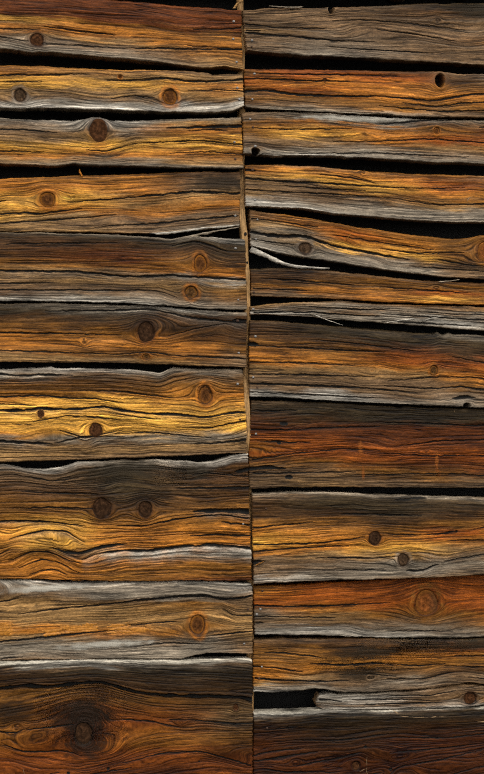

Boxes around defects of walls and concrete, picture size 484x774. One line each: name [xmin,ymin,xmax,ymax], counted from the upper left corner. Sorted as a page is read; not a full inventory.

crack [0,74,77,82]
crack [109,73,484,157]
crack [0,125,482,227]
crack [250,219,484,272]
crack [0,681,253,701]
crack [254,652,484,705]
crack [0,724,84,757]
crack [125,719,293,730]
crack [97,734,484,774]